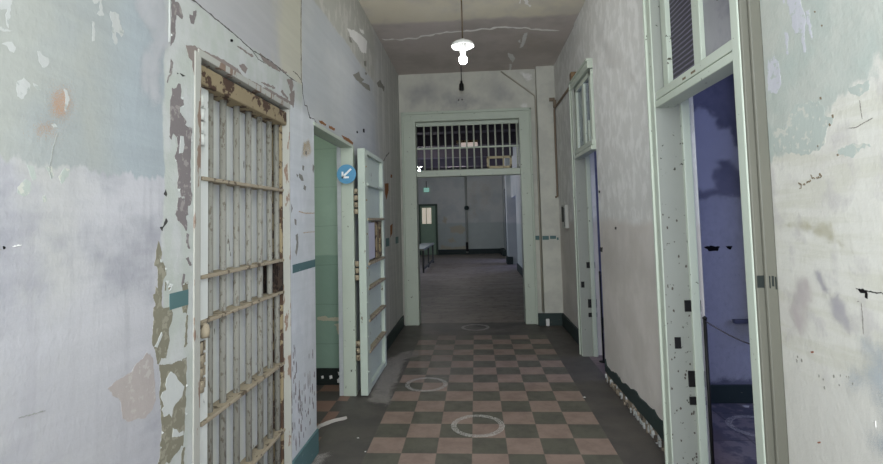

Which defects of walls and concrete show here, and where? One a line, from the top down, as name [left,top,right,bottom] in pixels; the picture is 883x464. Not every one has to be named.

peeling [0,0,16,53]
peeling [92,0,124,44]
crack [383,0,559,41]
peeling [767,0,823,94]
peeling [772,97,834,156]
peeling [108,0,295,464]
crack [856,288,883,334]
damp [786,269,883,462]
spalling [605,373,682,455]